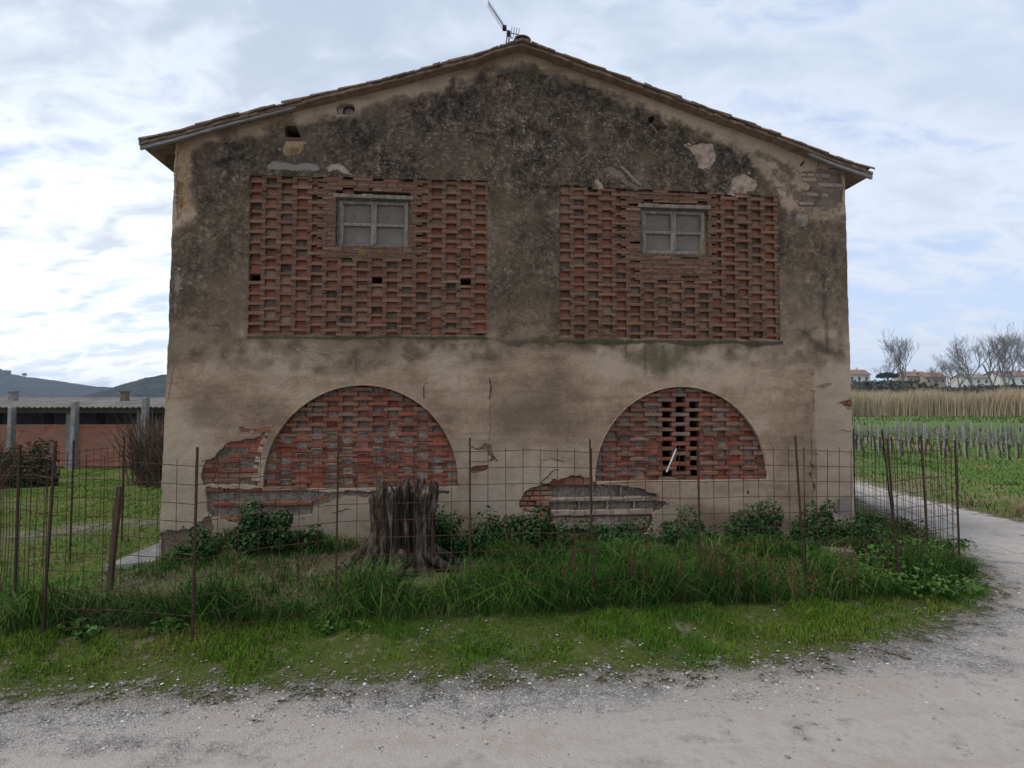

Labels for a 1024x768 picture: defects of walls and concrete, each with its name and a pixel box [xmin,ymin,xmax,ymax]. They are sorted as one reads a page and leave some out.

spalling [279,136,307,156]
spalling [326,163,352,175]
spalling [684,142,716,169]
spalling [727,172,758,197]
spalling [777,168,845,226]
crack [468,377,498,462]
spalling [468,442,494,474]
spalling [159,427,375,556]
spalling [519,476,664,537]